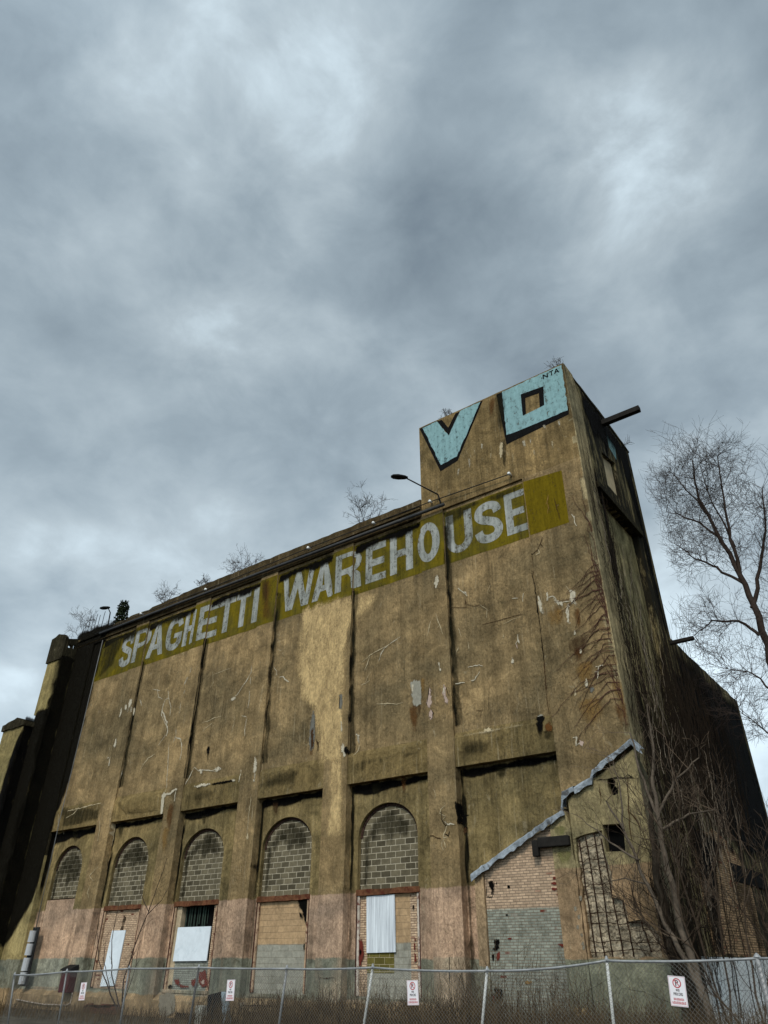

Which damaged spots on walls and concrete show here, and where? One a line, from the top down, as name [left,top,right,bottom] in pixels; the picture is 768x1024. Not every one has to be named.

crack [140,666,289,770]
peeling [410,680,449,720]
spalling [536,714,545,733]
crack [430,789,454,848]